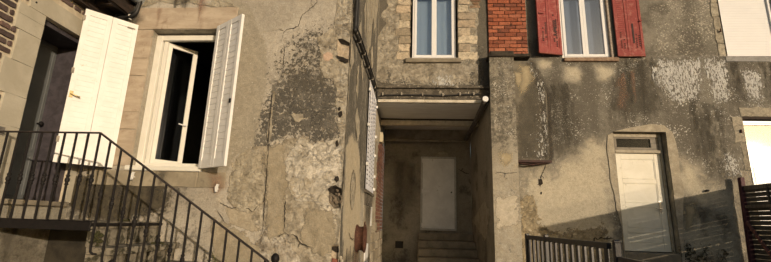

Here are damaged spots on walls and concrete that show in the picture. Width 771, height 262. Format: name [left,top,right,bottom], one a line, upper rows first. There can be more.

crack [217,0,336,249]
peeling [244,0,481,262]
efflorescence [651,56,765,118]